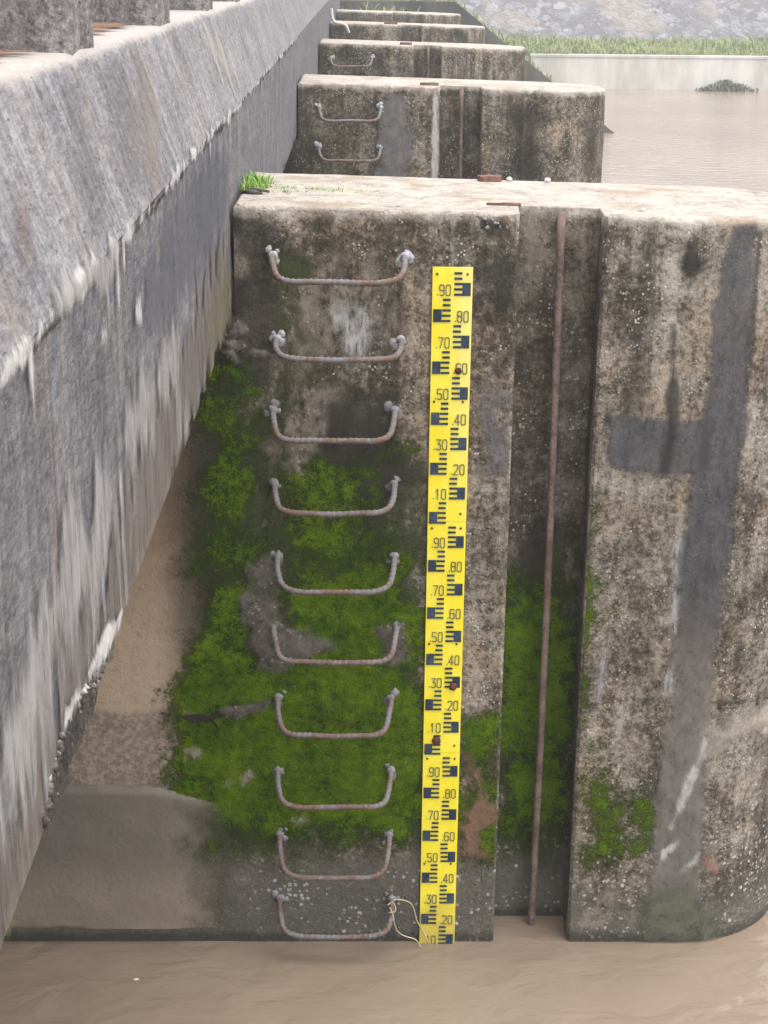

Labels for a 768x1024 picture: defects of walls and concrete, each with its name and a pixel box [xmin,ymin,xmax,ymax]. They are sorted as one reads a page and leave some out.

leakage [682,240,704,276]
leakage [661,326,679,472]
leakage [294,389,416,504]
leakage [669,737,708,830]
leakage [661,844,676,860]